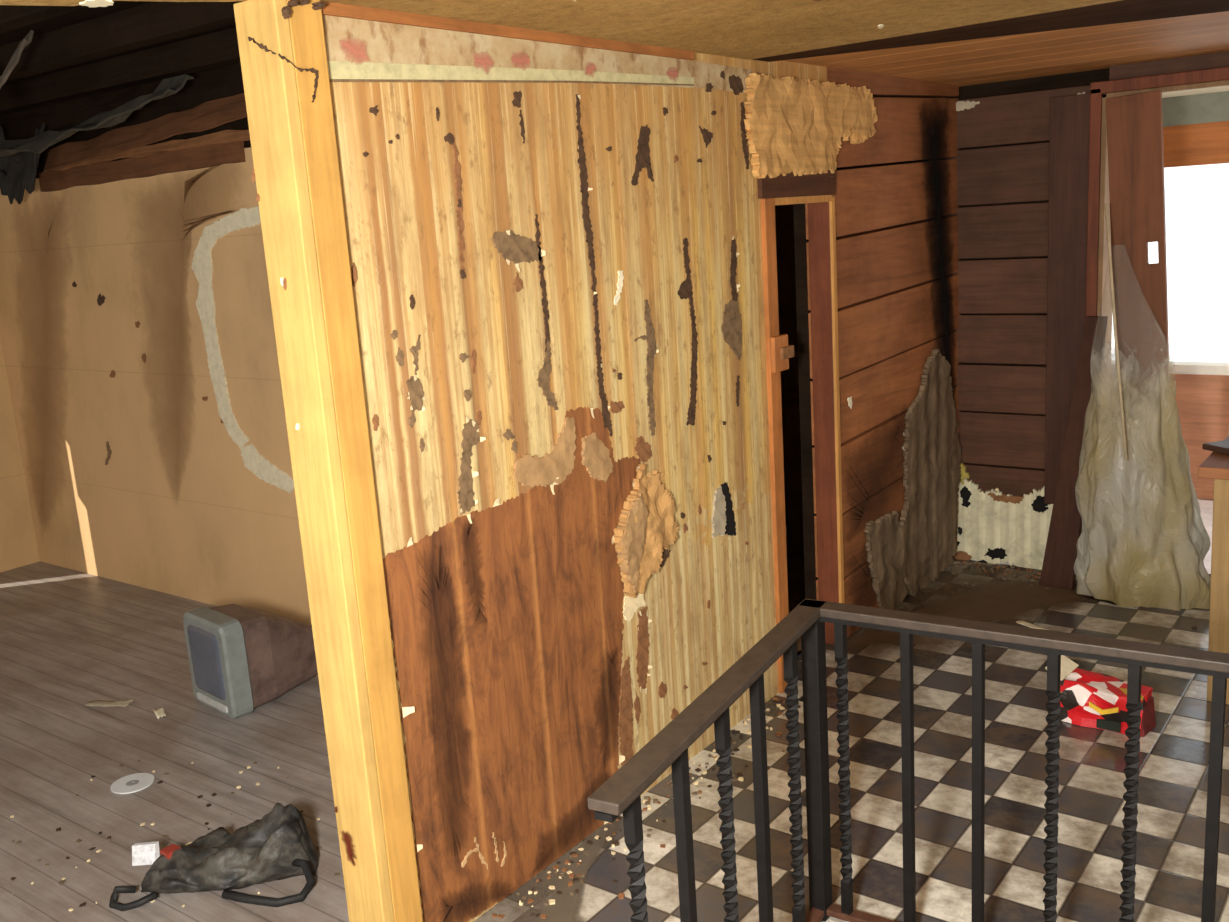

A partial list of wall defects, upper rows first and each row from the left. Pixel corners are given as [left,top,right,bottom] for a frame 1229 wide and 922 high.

crack [248,37,319,103]
peeling [744,73,878,179]
peeling [610,401,625,414]
peeling [503,429,517,453]
peeling [632,438,652,487]
peeling [864,349,1053,610]